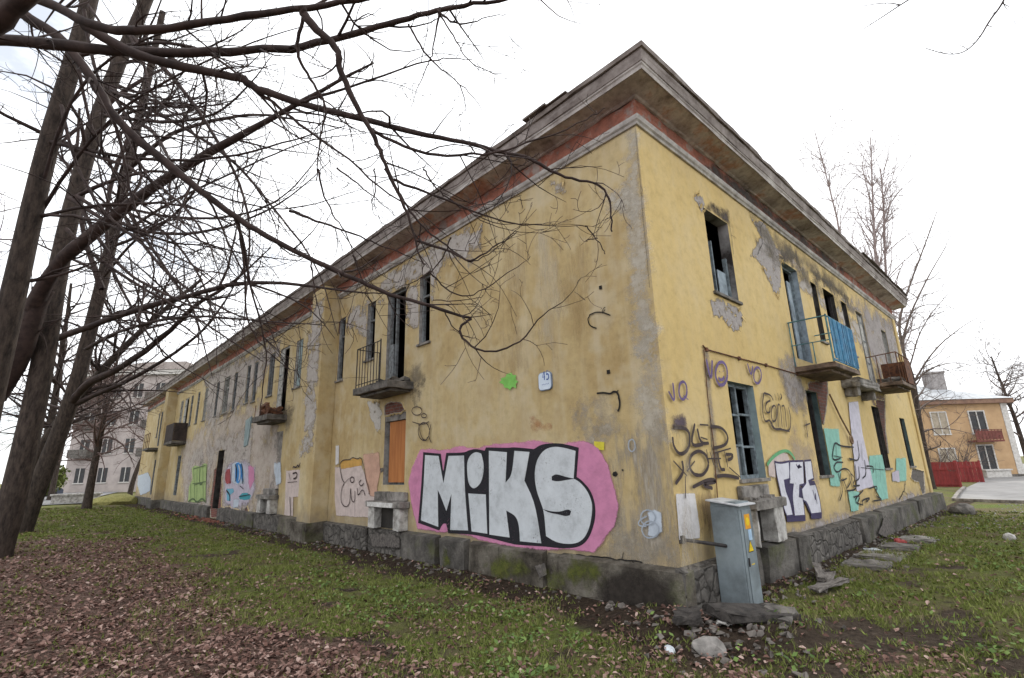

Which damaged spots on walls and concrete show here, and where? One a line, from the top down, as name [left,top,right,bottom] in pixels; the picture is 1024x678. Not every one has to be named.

peeling [338,224,482,338]
peeling [710,298,745,332]
peeling [751,219,784,298]
peeling [299,299,324,457]
spalling [367,400,406,434]